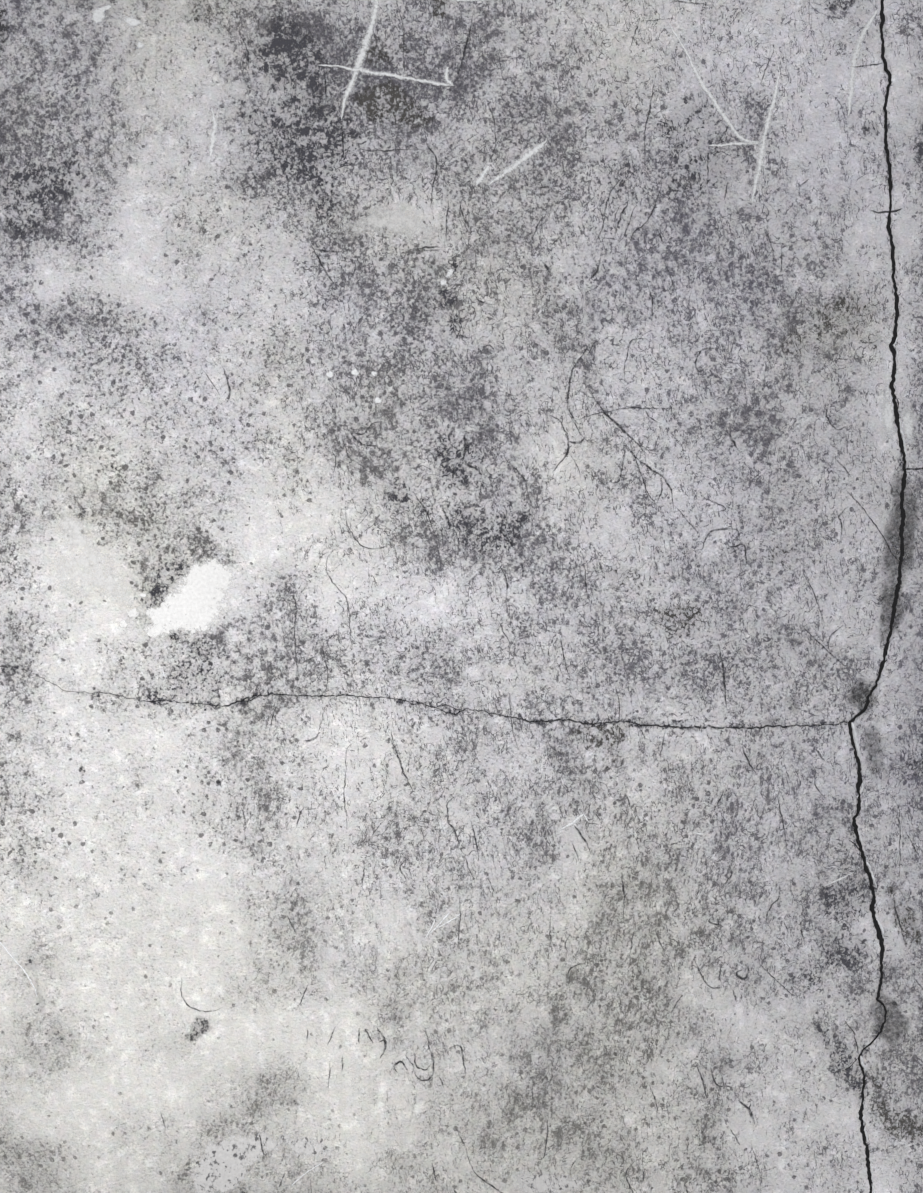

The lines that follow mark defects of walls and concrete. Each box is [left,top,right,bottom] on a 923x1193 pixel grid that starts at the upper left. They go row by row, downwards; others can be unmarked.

crack [341,131,466,251]
crack [312,247,356,283]
crack [333,421,381,472]
crack [326,554,352,643]
crack [387,0,923,1193]
crack [84,645,380,710]
crack [300,987,466,1088]